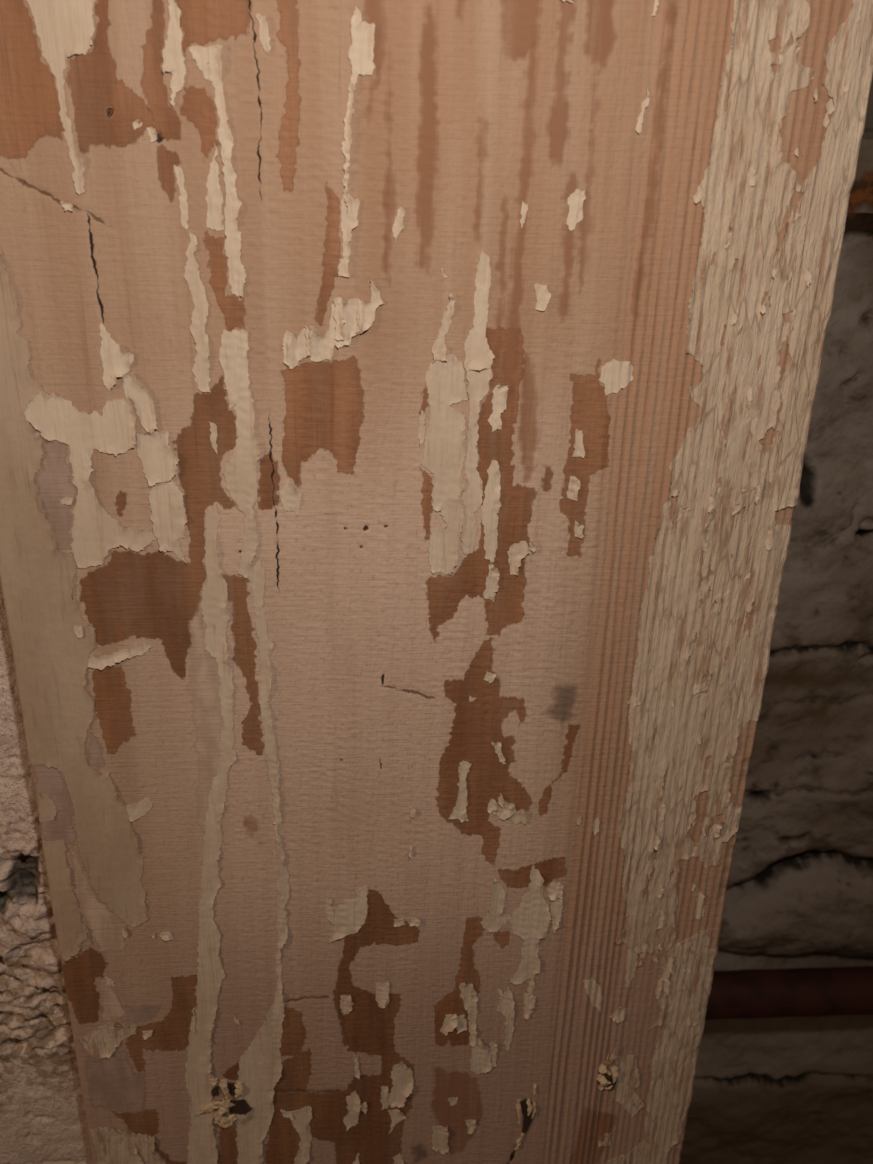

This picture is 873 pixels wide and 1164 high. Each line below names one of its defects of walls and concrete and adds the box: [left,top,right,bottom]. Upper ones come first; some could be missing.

peeling [520,201,528,228]
peeling [566,188,586,231]
rust [847,174,873,221]
peeling [0,0,421,1164]
peeling [583,0,873,1164]
peeling [418,249,633,1074]
peeling [431,1125,449,1155]
peeling [465,1119,478,1134]